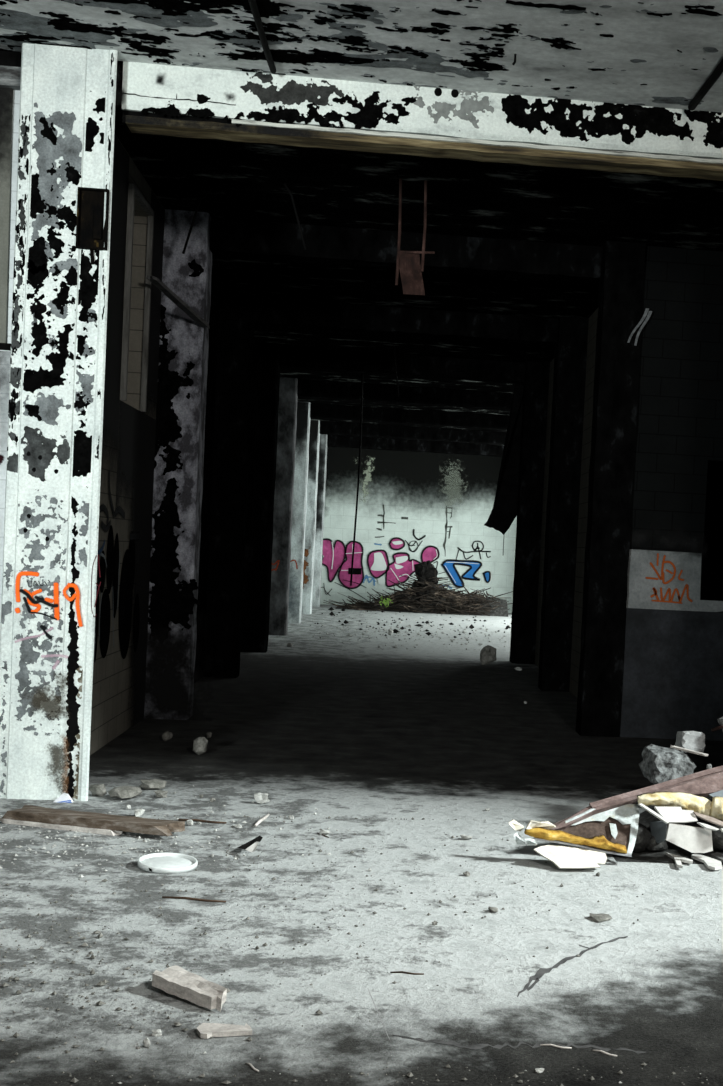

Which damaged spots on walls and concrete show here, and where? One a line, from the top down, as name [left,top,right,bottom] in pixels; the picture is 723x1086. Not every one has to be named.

peeling [0,0,723,801]
crack [517,936,628,997]